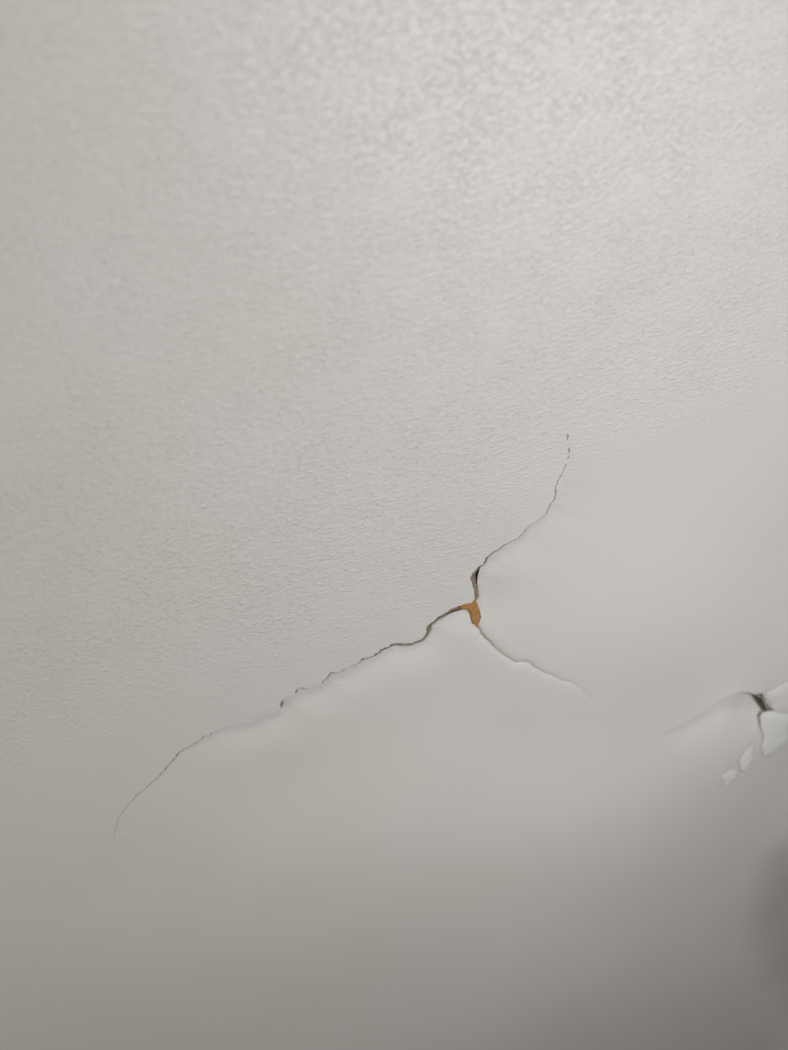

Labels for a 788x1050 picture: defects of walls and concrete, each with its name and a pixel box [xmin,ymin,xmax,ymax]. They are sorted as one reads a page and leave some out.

crack [322,434,577,686]
flaking render [721,711,788,786]